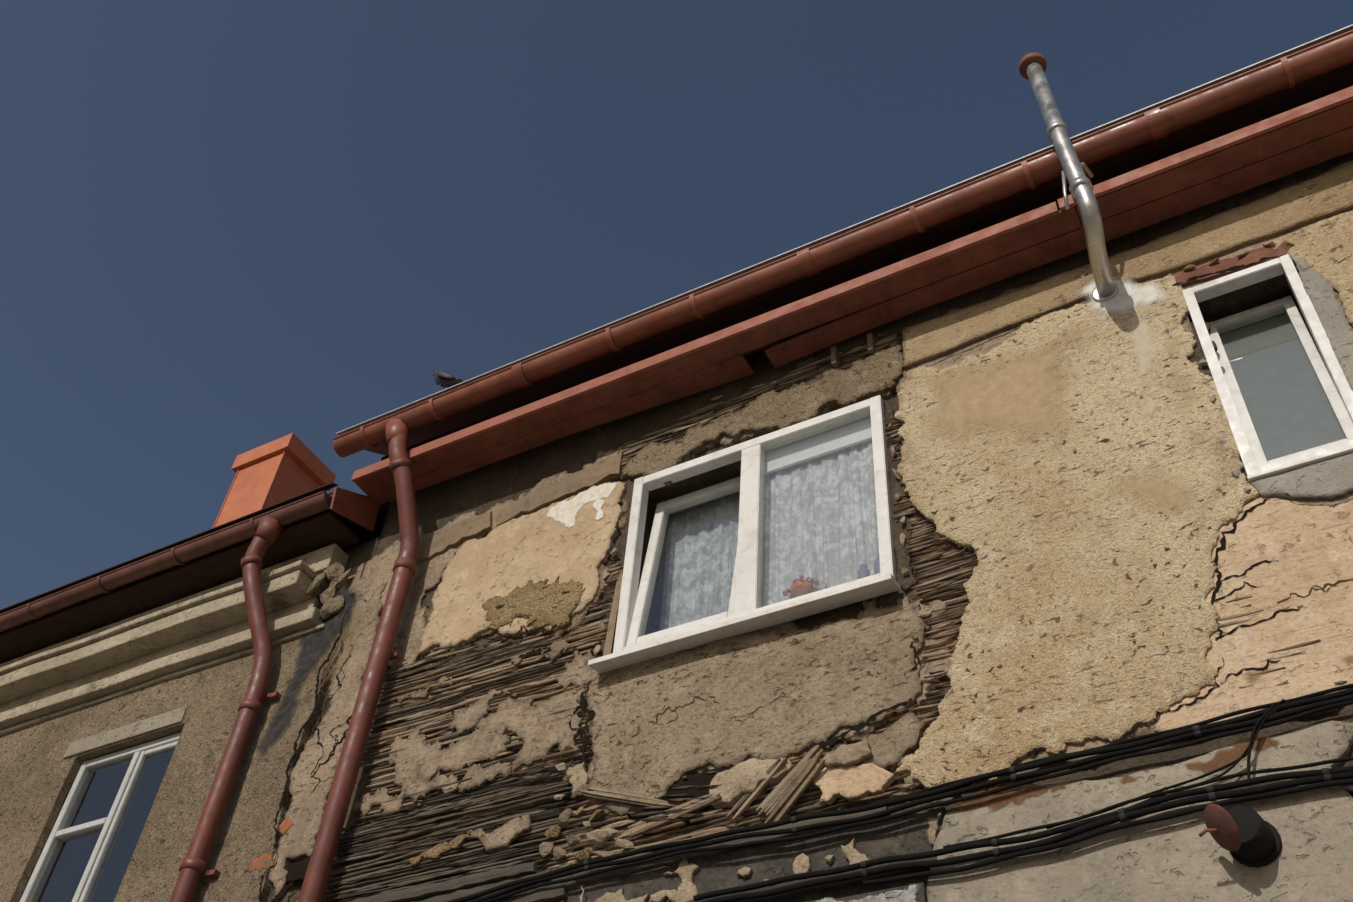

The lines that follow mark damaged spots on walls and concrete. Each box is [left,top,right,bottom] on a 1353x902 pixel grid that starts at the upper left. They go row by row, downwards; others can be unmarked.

flaking render [305,562,351,619]
flaking render [323,331,978,902]
crack [1112,491,1353,742]
crack [258,611,353,902]
crack [1011,742,1066,765]